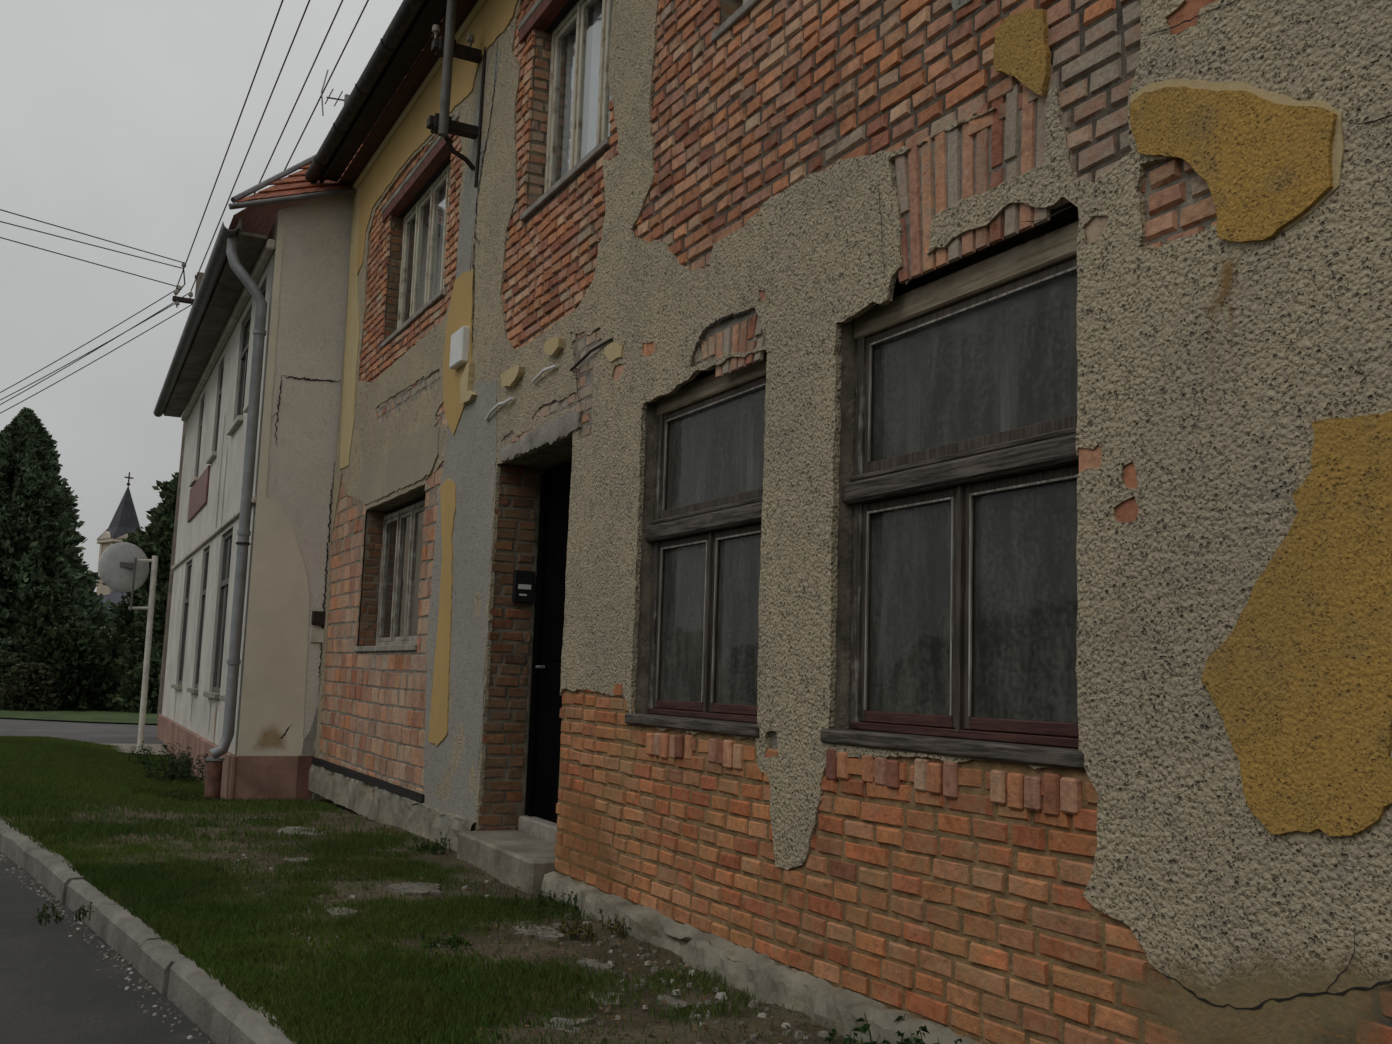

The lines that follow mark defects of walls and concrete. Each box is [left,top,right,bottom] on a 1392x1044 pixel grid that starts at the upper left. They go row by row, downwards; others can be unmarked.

spalling [634,0,1345,284]
peeling [302,0,624,831]
spalling [693,290,767,379]
spalling [1079,445,1102,473]
spalling [1115,462,1139,523]
peeling [1201,411,1392,836]
spalling [554,683,1187,1044]
spalling [1324,989,1392,1044]